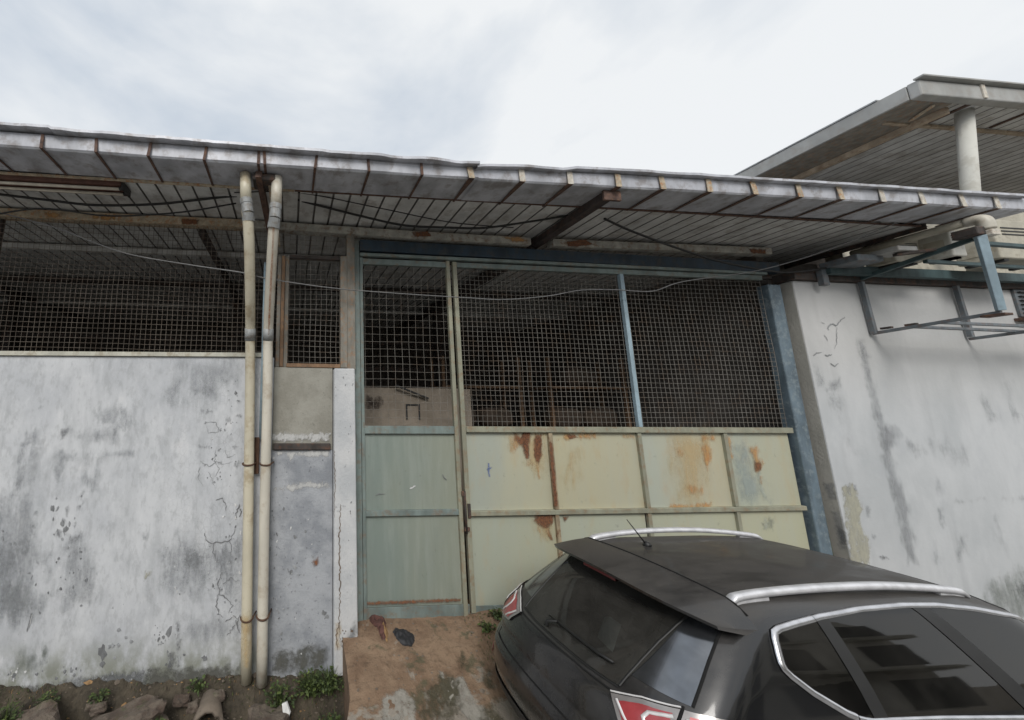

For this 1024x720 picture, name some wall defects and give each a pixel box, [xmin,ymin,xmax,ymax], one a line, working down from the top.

crack [814,317,845,367]
crack [204,498,242,641]
peeling [271,433,331,462]
crack [333,452,341,650]
corrosion [513,432,567,540]
peeling [839,484,885,564]
leakage [891,480,914,559]
leakage [145,666,237,684]